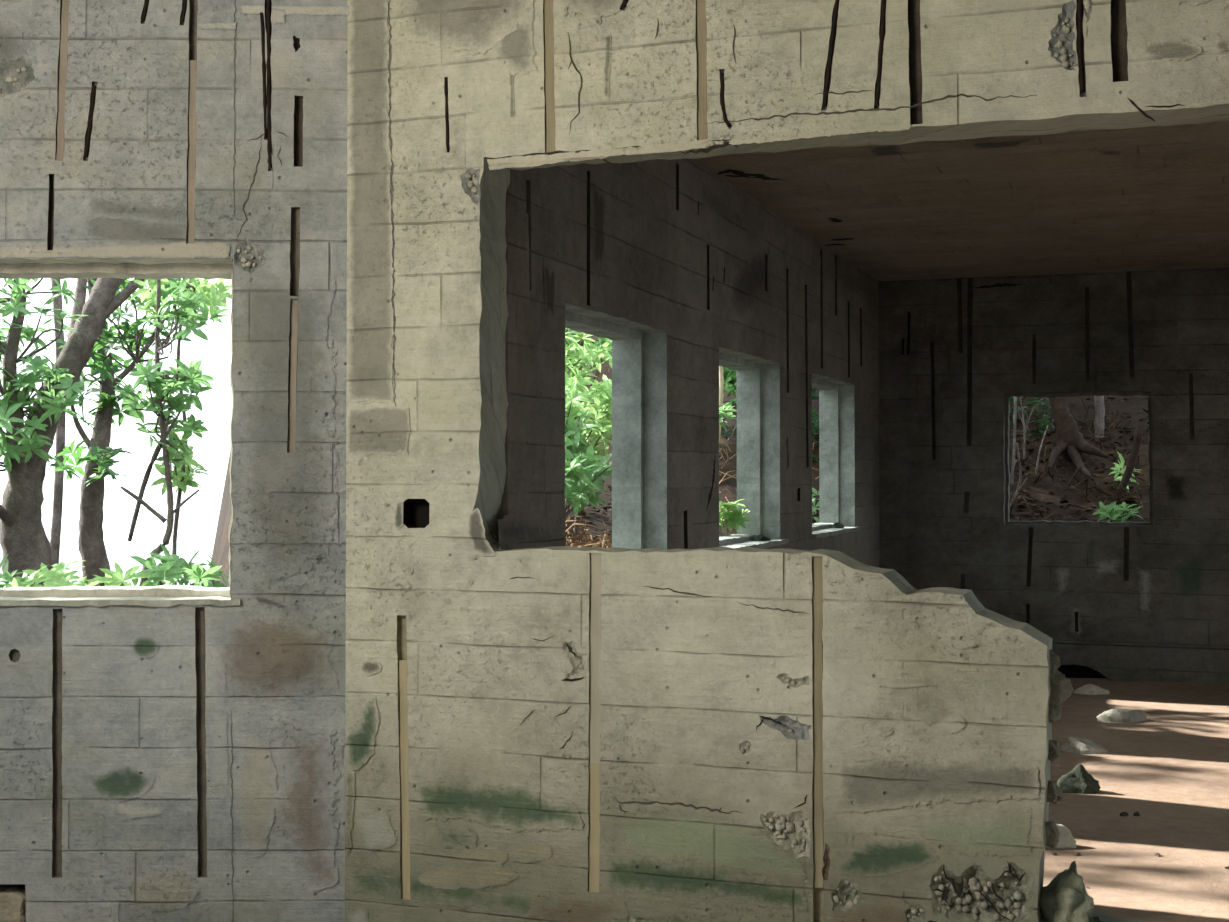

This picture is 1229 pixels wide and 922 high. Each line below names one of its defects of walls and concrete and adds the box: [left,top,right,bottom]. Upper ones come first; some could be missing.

spalling [0,58,35,98]
crack [680,90,1033,180]
spalling [1048,0,1092,97]
crack [1128,98,1184,122]
damp [1143,39,1202,61]
damp [198,0,538,581]
damp [360,660,381,675]
damp [210,597,338,858]
damp [345,771,397,855]
crack [614,795,743,814]
spalling [759,810,865,913]
spalling [906,862,1034,922]